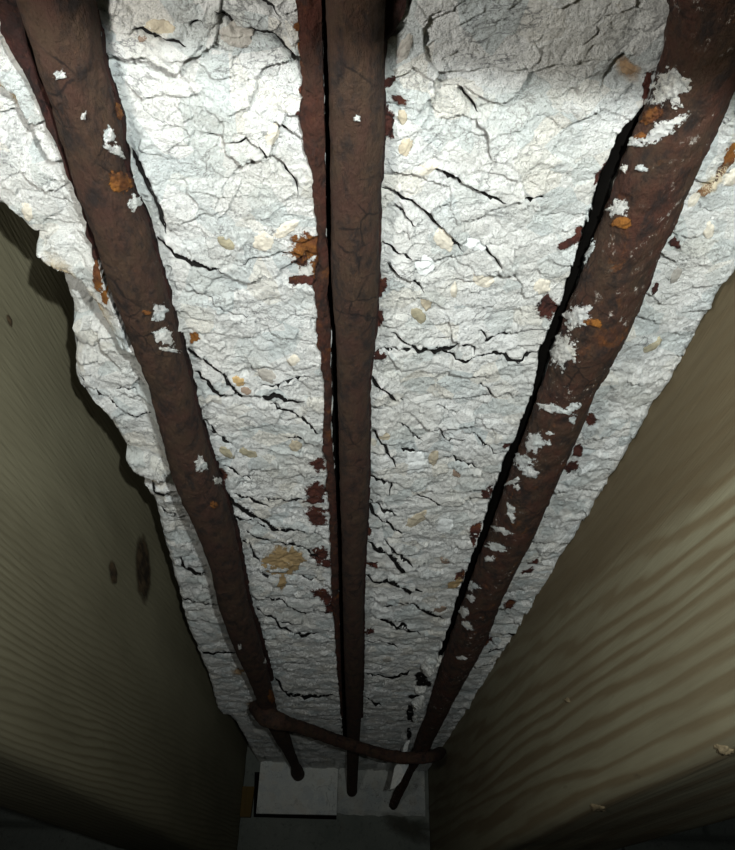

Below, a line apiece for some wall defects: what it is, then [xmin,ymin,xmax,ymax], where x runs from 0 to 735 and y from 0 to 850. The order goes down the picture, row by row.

rust [385,75,409,139]
crack [460,86,478,112]
crack [131,147,224,274]
rust [282,230,319,288]
rust [557,226,583,250]
rust [535,292,561,321]
spalling [0,0,397,797]
crack [186,0,347,737]
crack [366,105,645,659]
spalling [325,0,735,752]
rust [302,457,329,527]
spalling [389,763,432,810]